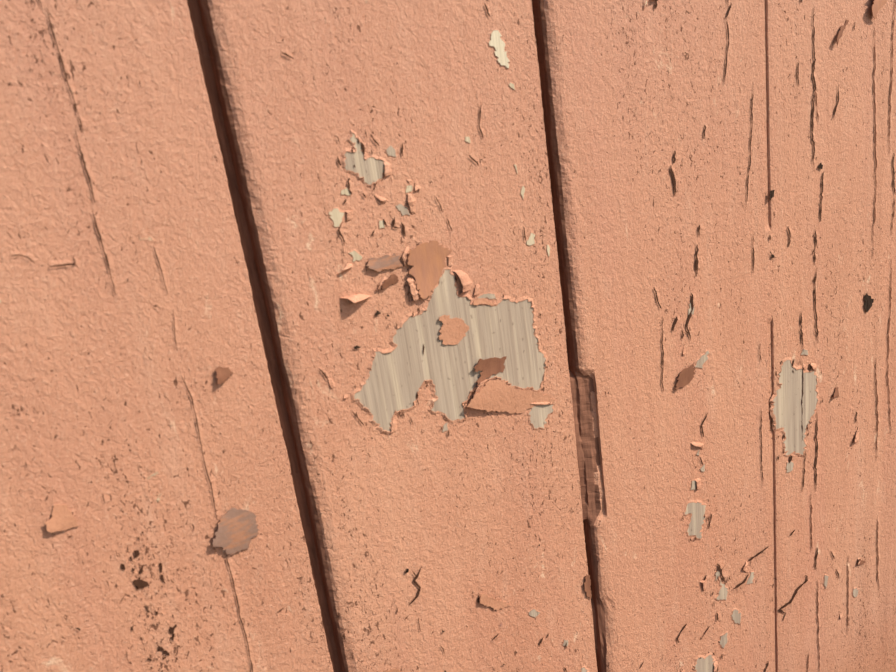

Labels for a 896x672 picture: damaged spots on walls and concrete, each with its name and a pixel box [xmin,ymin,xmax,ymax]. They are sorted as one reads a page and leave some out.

peeling [337,130,397,196]
peeling [327,207,353,228]
peeling [394,179,421,216]
peeling [350,241,555,437]
peeling [769,348,839,473]
peeling [212,508,259,554]